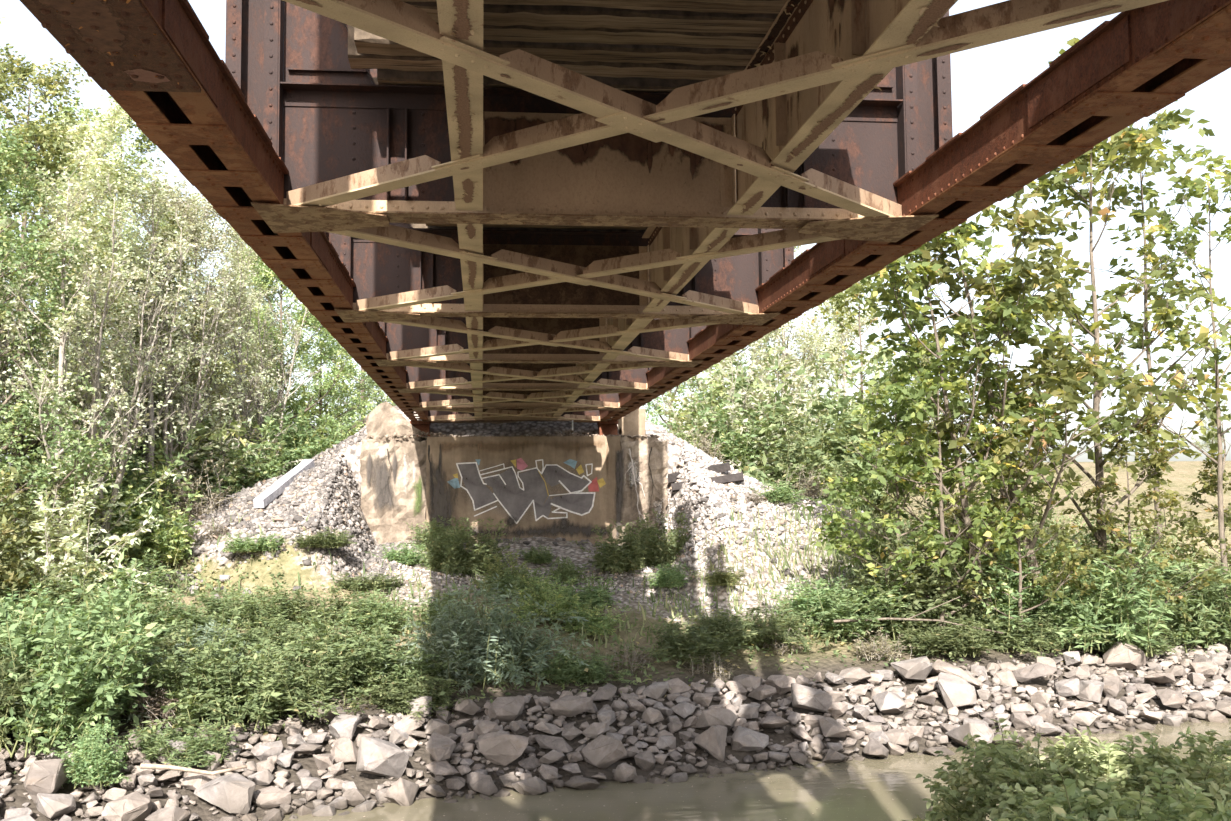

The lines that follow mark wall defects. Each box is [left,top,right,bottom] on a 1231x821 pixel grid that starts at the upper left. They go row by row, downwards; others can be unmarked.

peeling [449,0,474,40]
corrosion [828,0,844,45]
peeling [906,0,971,57]
peeling [1043,6,1121,26]
peeling [451,65,479,203]
peeling [465,260,481,289]